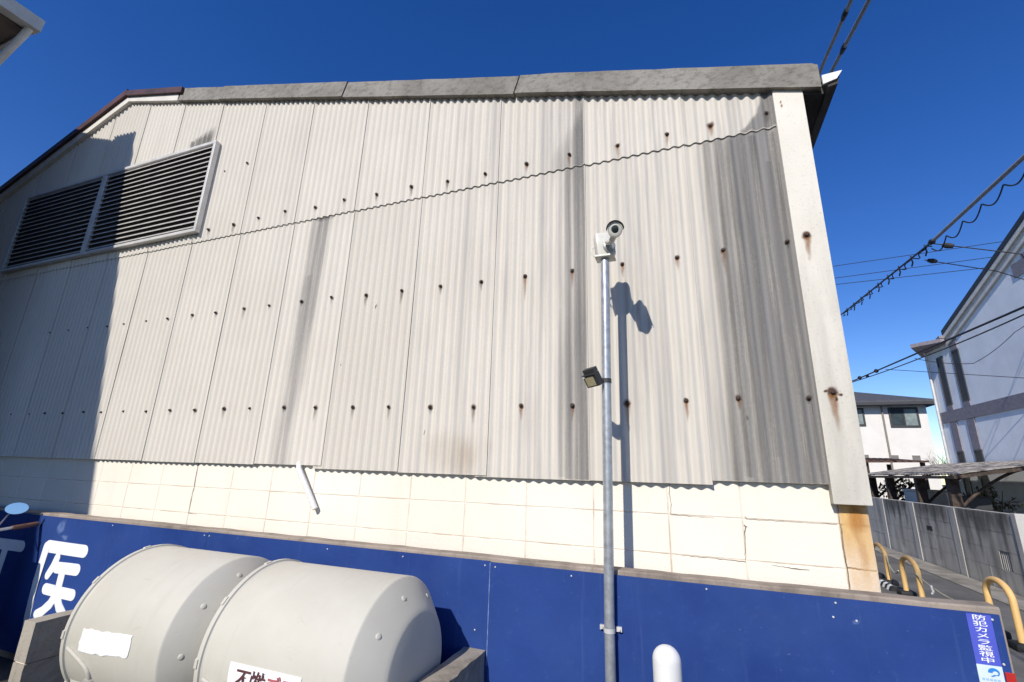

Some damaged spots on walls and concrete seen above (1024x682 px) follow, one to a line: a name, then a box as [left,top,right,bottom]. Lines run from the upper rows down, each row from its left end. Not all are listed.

leakage [575,96,583,227]
leakage [727,92,829,484]
crack [677,505,875,590]
rust [840,505,873,561]